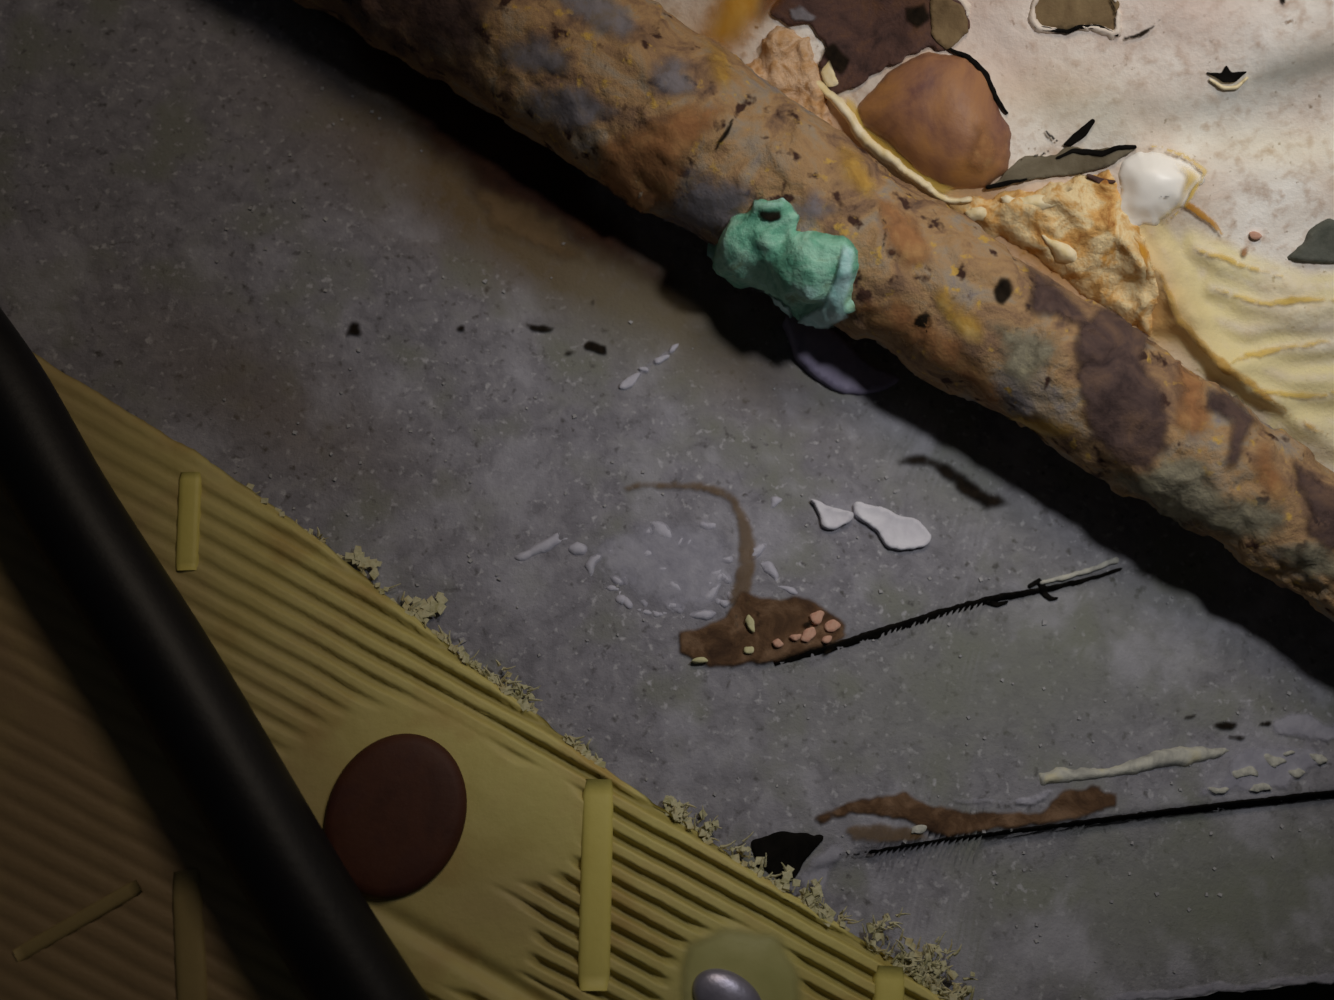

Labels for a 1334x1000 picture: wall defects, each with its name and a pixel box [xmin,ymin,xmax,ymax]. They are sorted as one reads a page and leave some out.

rust [710,0,778,43]
spalling [1028,0,1122,40]
rust [334,17,627,255]
rust [746,25,834,126]
peeling [770,0,972,204]
peeling [986,145,1137,190]
peeling [1207,66,1248,90]
rust [707,198,1000,402]
rust [843,48,1257,468]
peeling [1287,218,1334,264]
crack [774,557,1122,666]
crack [840,790,1334,856]